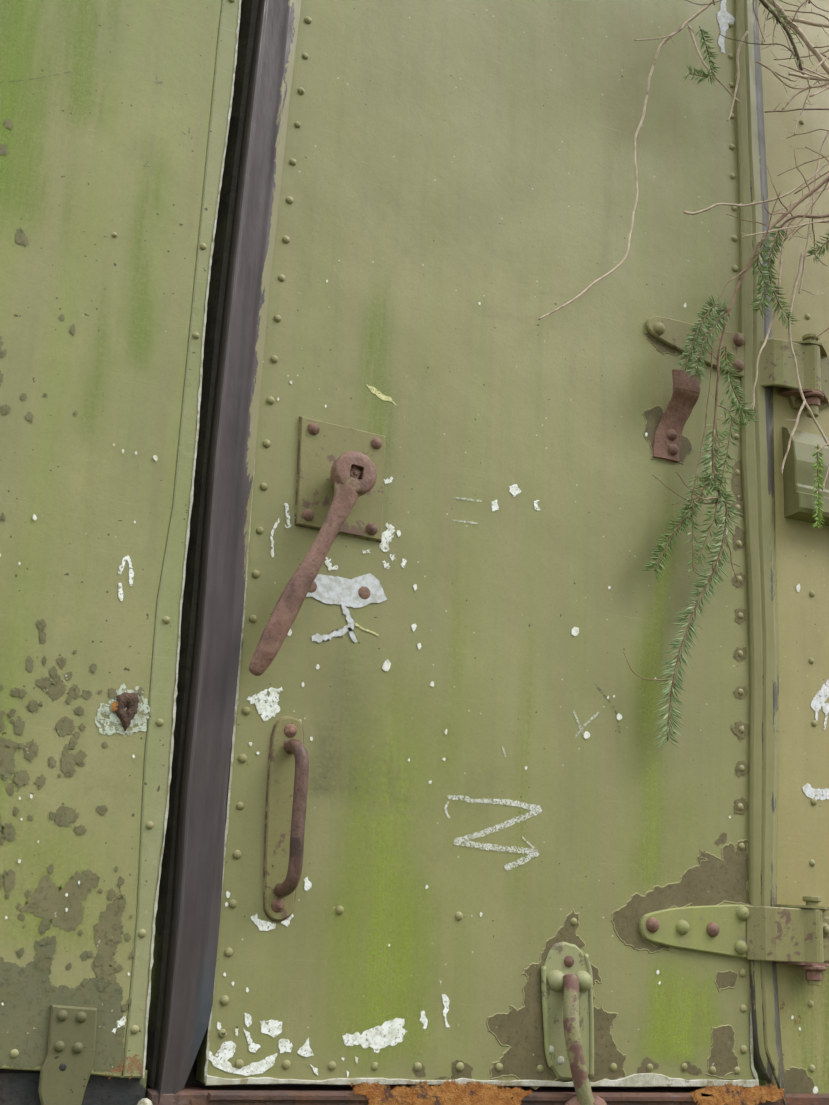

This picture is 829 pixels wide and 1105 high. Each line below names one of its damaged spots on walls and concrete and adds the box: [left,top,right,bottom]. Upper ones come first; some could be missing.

peeling [641,405,693,465]
peeling [306,523,407,643]
peeling [0,619,117,846]
rust [95,684,150,737]
peeling [611,832,749,954]
peeling [0,863,136,1072]
peeling [486,909,660,1090]
peeling [208,1013,318,1076]
peeling [342,1018,407,1077]
peeling [681,1024,739,1079]
rust [351,1079,532,1105]
rust [690,1082,788,1105]